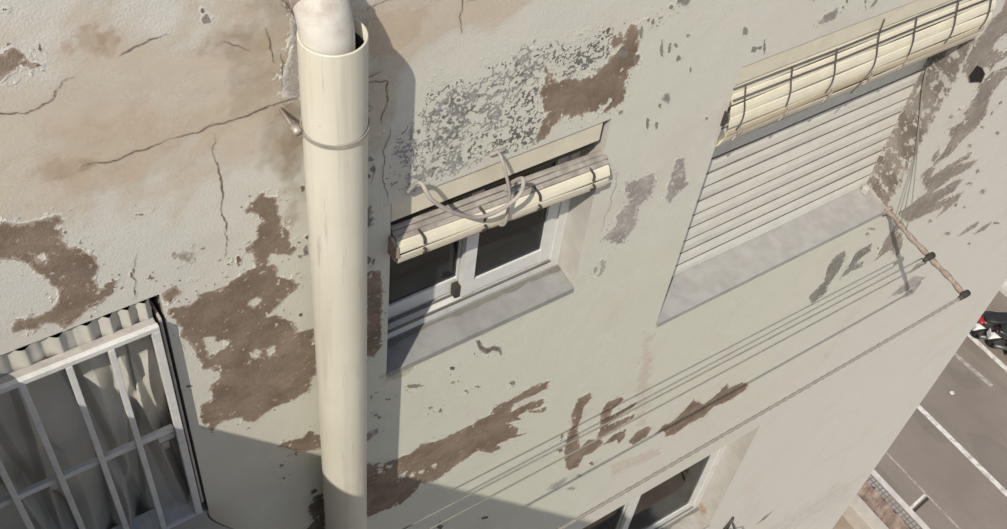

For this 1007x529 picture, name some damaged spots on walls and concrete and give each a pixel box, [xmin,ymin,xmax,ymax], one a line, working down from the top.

peeling [0,40,50,88]
crack [0,76,75,115]
crack [80,27,298,257]
spalling [198,5,214,26]
peeling [368,0,693,230]
peeling [589,152,694,279]
peeling [806,0,1007,307]
peeling [0,189,317,436]
peeling [367,253,389,363]
peeling [367,376,551,518]
peeling [543,379,752,494]